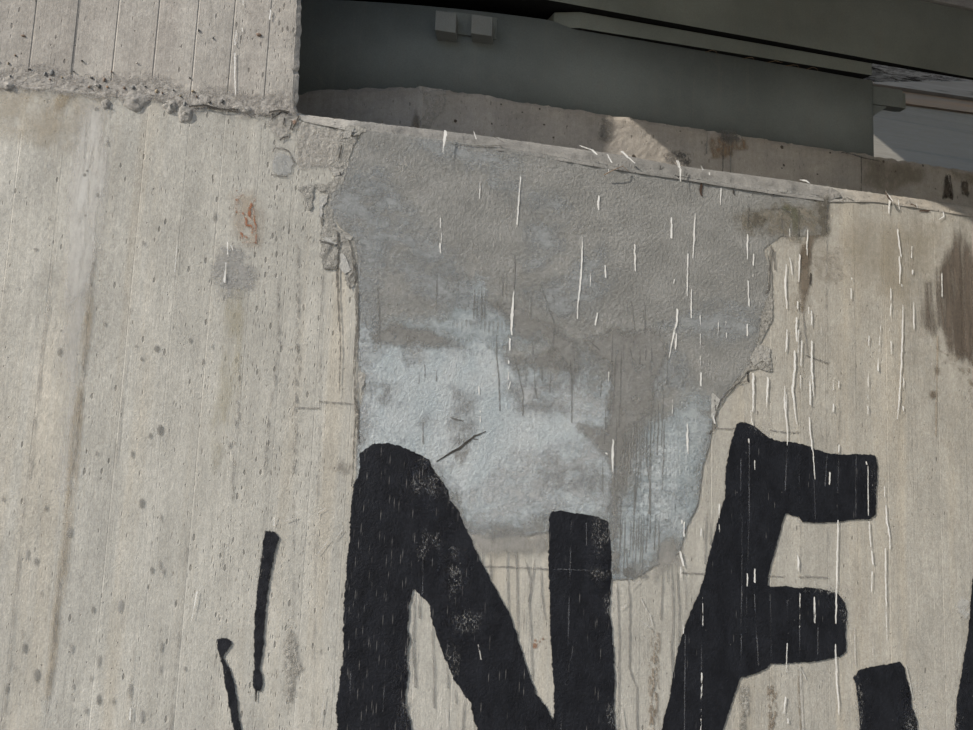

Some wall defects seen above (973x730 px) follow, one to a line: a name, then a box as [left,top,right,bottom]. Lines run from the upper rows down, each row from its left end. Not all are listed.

spalling [270,112,299,141]
spalling [298,125,366,289]
spalling [708,246,776,434]
leakage [741,200,828,444]
leakage [868,229,973,419]
crack [437,417,486,462]